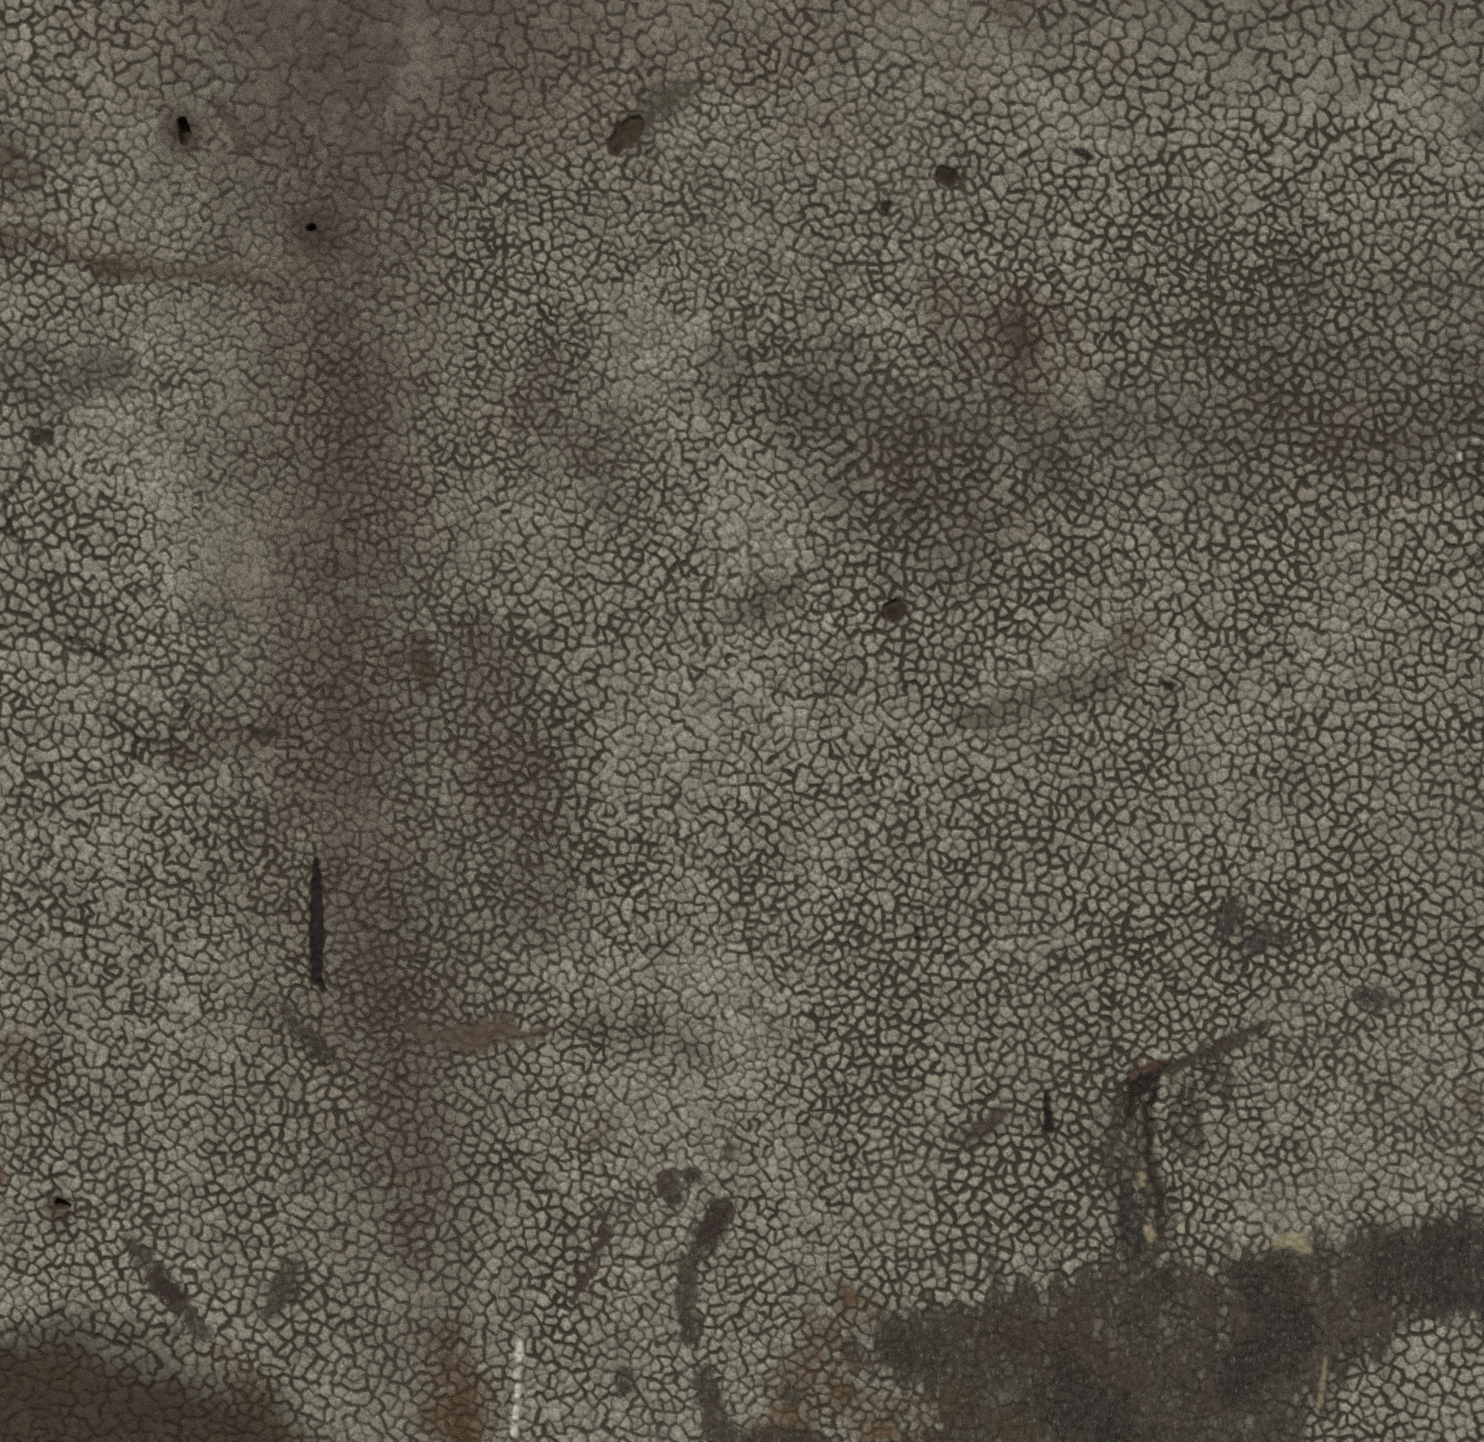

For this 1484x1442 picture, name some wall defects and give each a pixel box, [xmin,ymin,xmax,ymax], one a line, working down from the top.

crack [0,458,29,555]
crack [57,633,119,672]
crack [107,692,197,760]
water stain [1369,1217,1484,1329]
water stain [0,1342,286,1442]